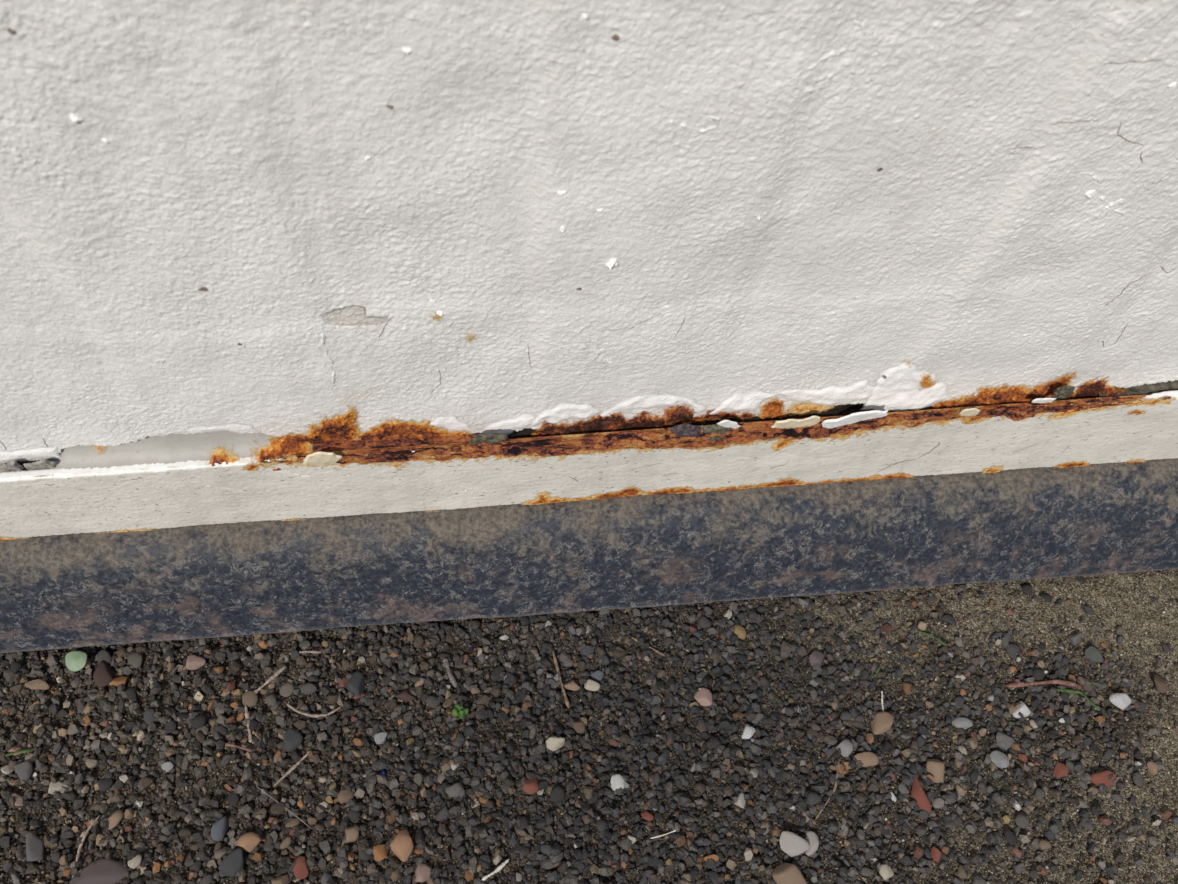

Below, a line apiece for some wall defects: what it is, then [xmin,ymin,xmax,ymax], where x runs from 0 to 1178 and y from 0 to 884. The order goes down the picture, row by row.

peeling [319,306,390,327]
corrosion [209,373,1177,471]
peeling [717,420,740,429]
peeling [771,410,888,429]
corrosion [522,473,914,505]